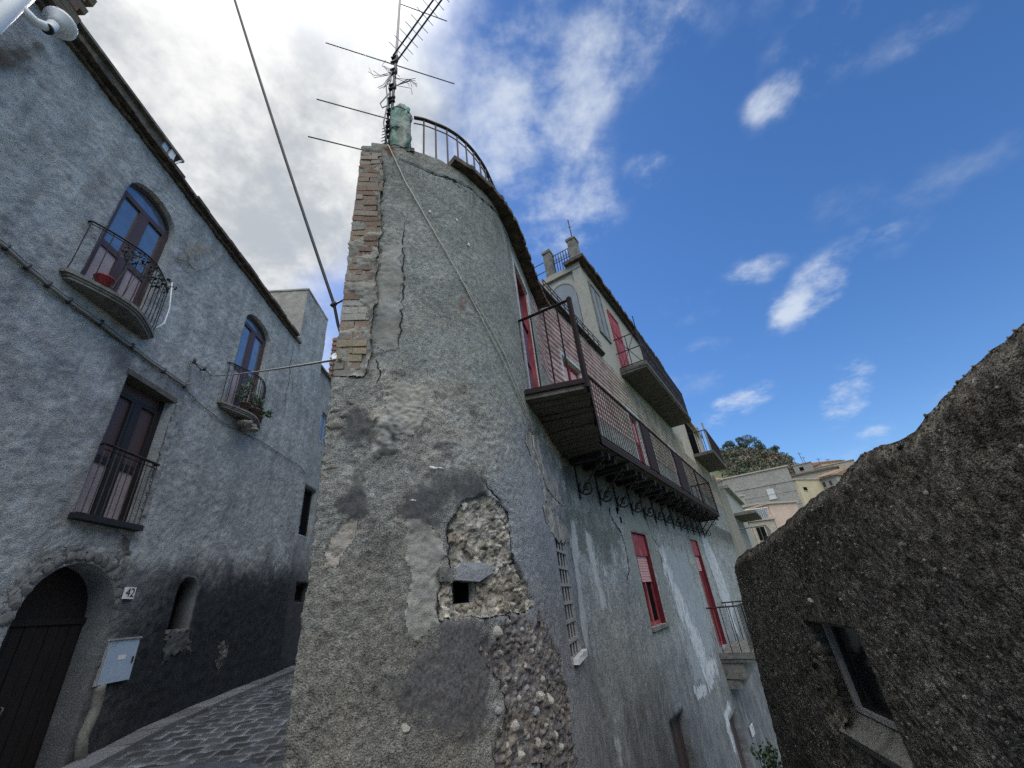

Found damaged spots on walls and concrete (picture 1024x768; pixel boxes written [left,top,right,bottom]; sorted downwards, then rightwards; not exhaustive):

flaking render [334,151,384,377]
crack [397,222,405,347]
water stain [335,472,367,519]
water stain [401,465,488,525]
flaking render [437,495,534,621]
water stain [377,618,495,742]